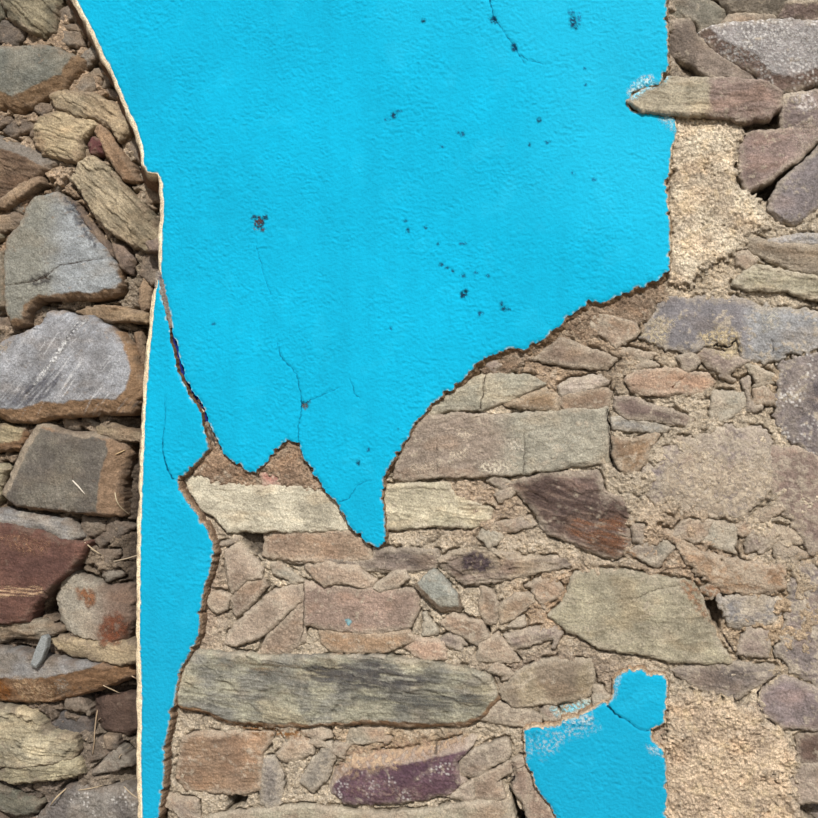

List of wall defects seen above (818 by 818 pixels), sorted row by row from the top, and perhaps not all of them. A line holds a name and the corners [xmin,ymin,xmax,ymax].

flaking render [67,0,164,818]
crack [155,270,222,450]
spalling [158,116,803,818]
spalling [626,0,671,113]